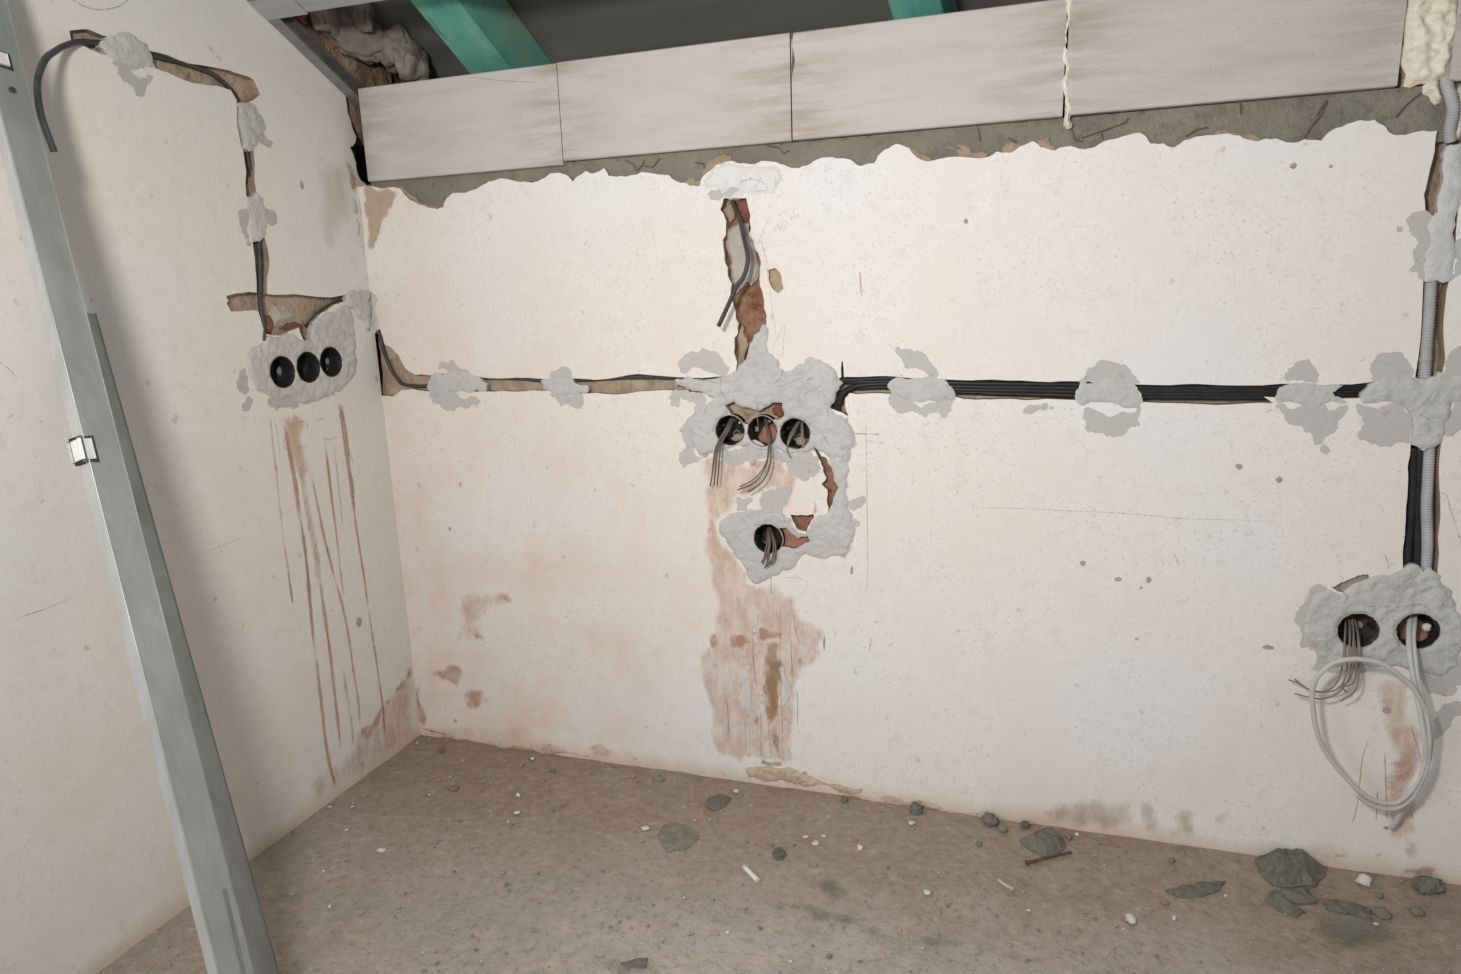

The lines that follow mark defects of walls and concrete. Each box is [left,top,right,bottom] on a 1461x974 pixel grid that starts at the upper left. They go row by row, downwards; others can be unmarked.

peeling [705,164,780,199]
flaking render [365,186,394,247]